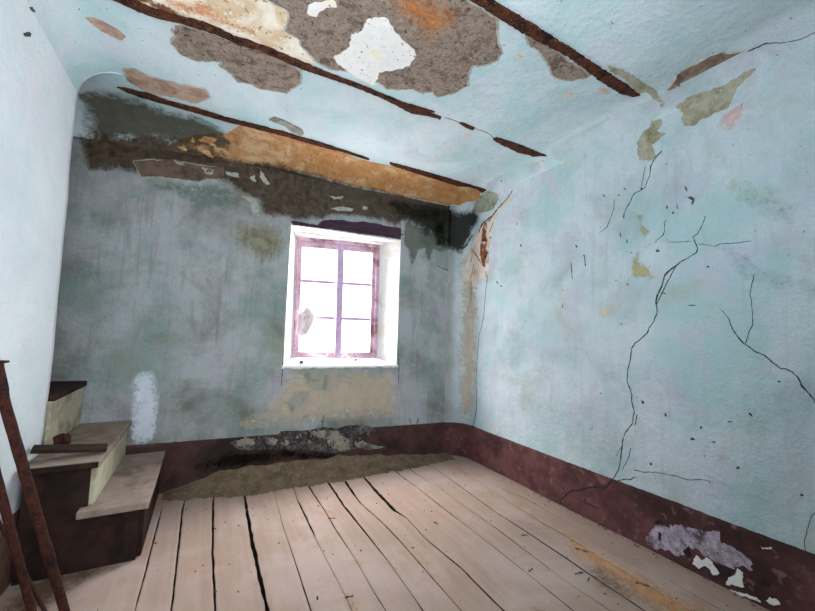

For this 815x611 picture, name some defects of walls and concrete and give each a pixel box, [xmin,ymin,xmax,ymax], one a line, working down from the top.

spalling [85,17,126,41]
spalling [122,67,212,104]
spalling [138,0,503,98]
spalling [524,35,591,82]
peeling [604,49,756,126]
leakage [80,92,478,263]
peeling [636,119,666,161]
spalling [230,370,388,454]
leakage [252,373,394,423]
crack [555,217,748,509]
crack [721,274,815,403]
spalling [713,564,735,578]